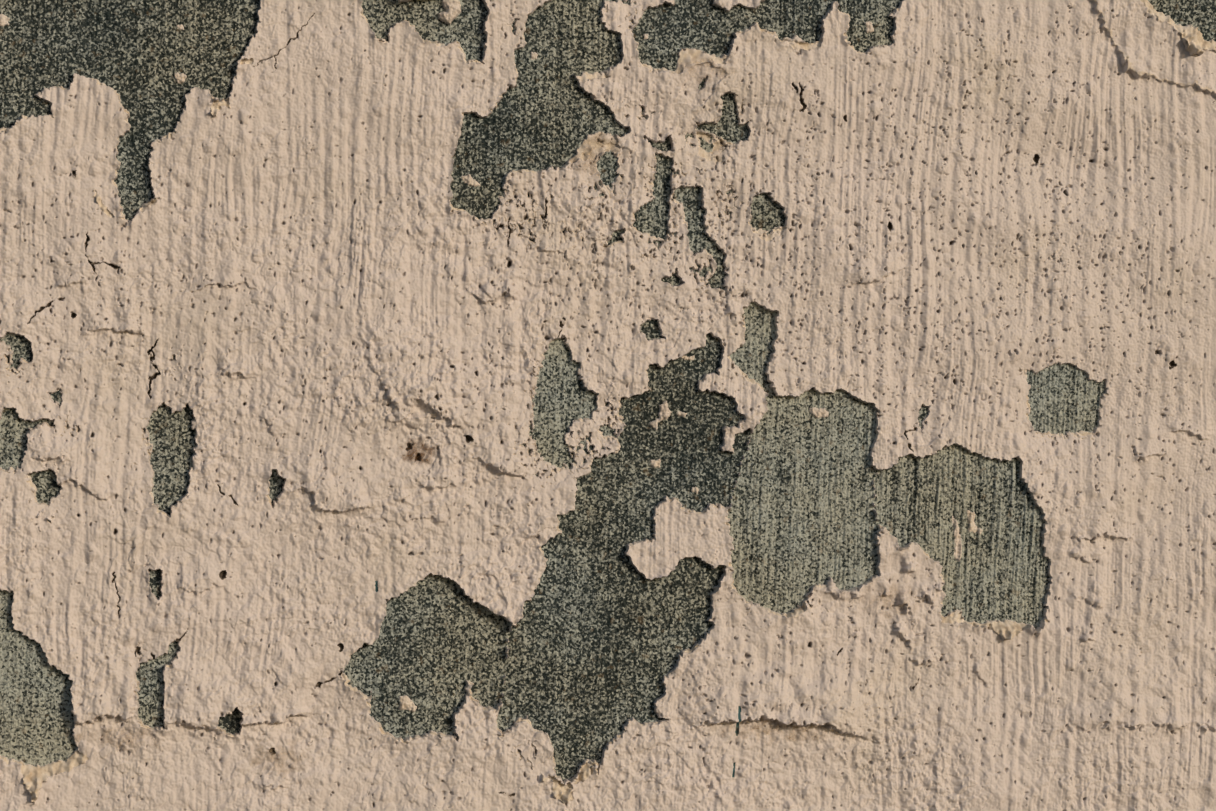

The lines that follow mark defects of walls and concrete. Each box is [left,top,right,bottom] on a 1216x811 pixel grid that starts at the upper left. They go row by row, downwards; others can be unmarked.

peeling [360,0,490,64]
peeling [1093,0,1216,94]
peeling [0,0,261,221]
peeling [449,0,904,292]
peeling [0,388,81,506]
peeling [141,402,198,518]
peeling [1023,362,1109,444]
peeling [337,301,1053,804]
peeling [0,589,89,805]
peeling [134,640,181,730]